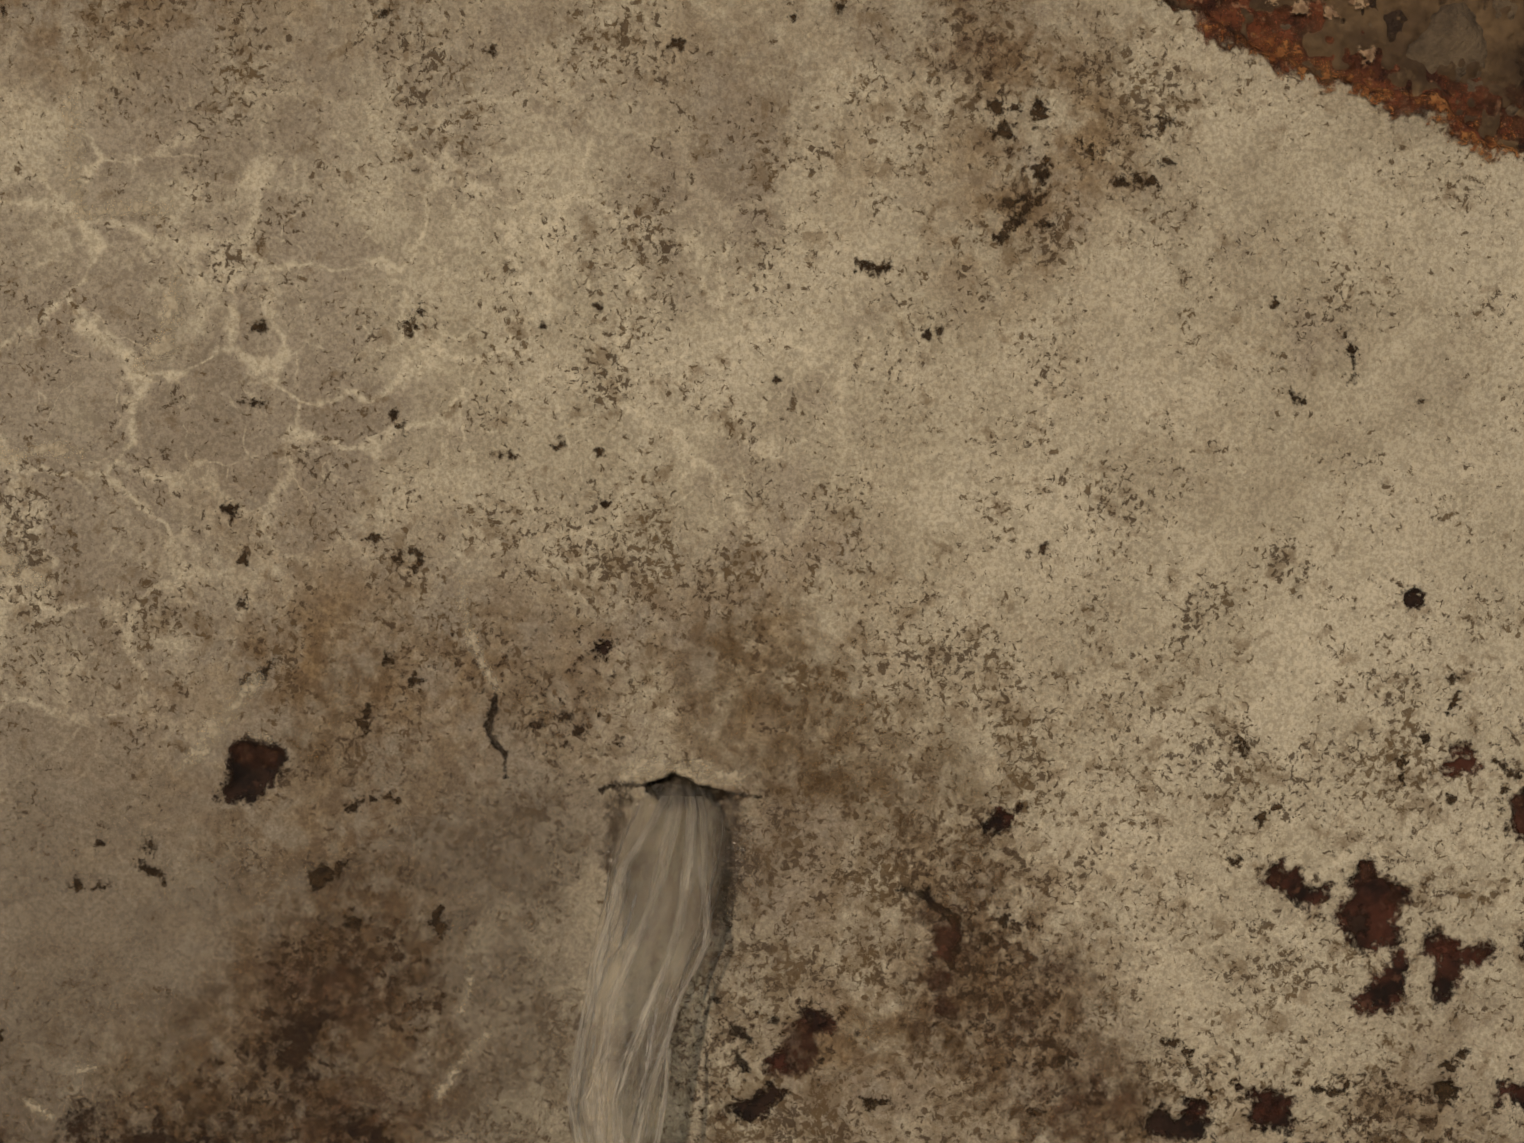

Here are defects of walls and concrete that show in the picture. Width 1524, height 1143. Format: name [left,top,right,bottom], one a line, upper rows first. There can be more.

rust [1425,716,1523,783]
leakage [602,788,633,874]
crack [598,779,664,792]
leakage [687,786,745,921]
crack [720,790,762,801]
rust [1486,789,1524,854]
rust [1256,851,1497,1031]
leakage [438,1049,473,1099]
rust [725,999,860,1123]
rust [1235,1083,1323,1143]
rust [1428,1078,1464,1107]
rust [1493,1056,1524,1126]